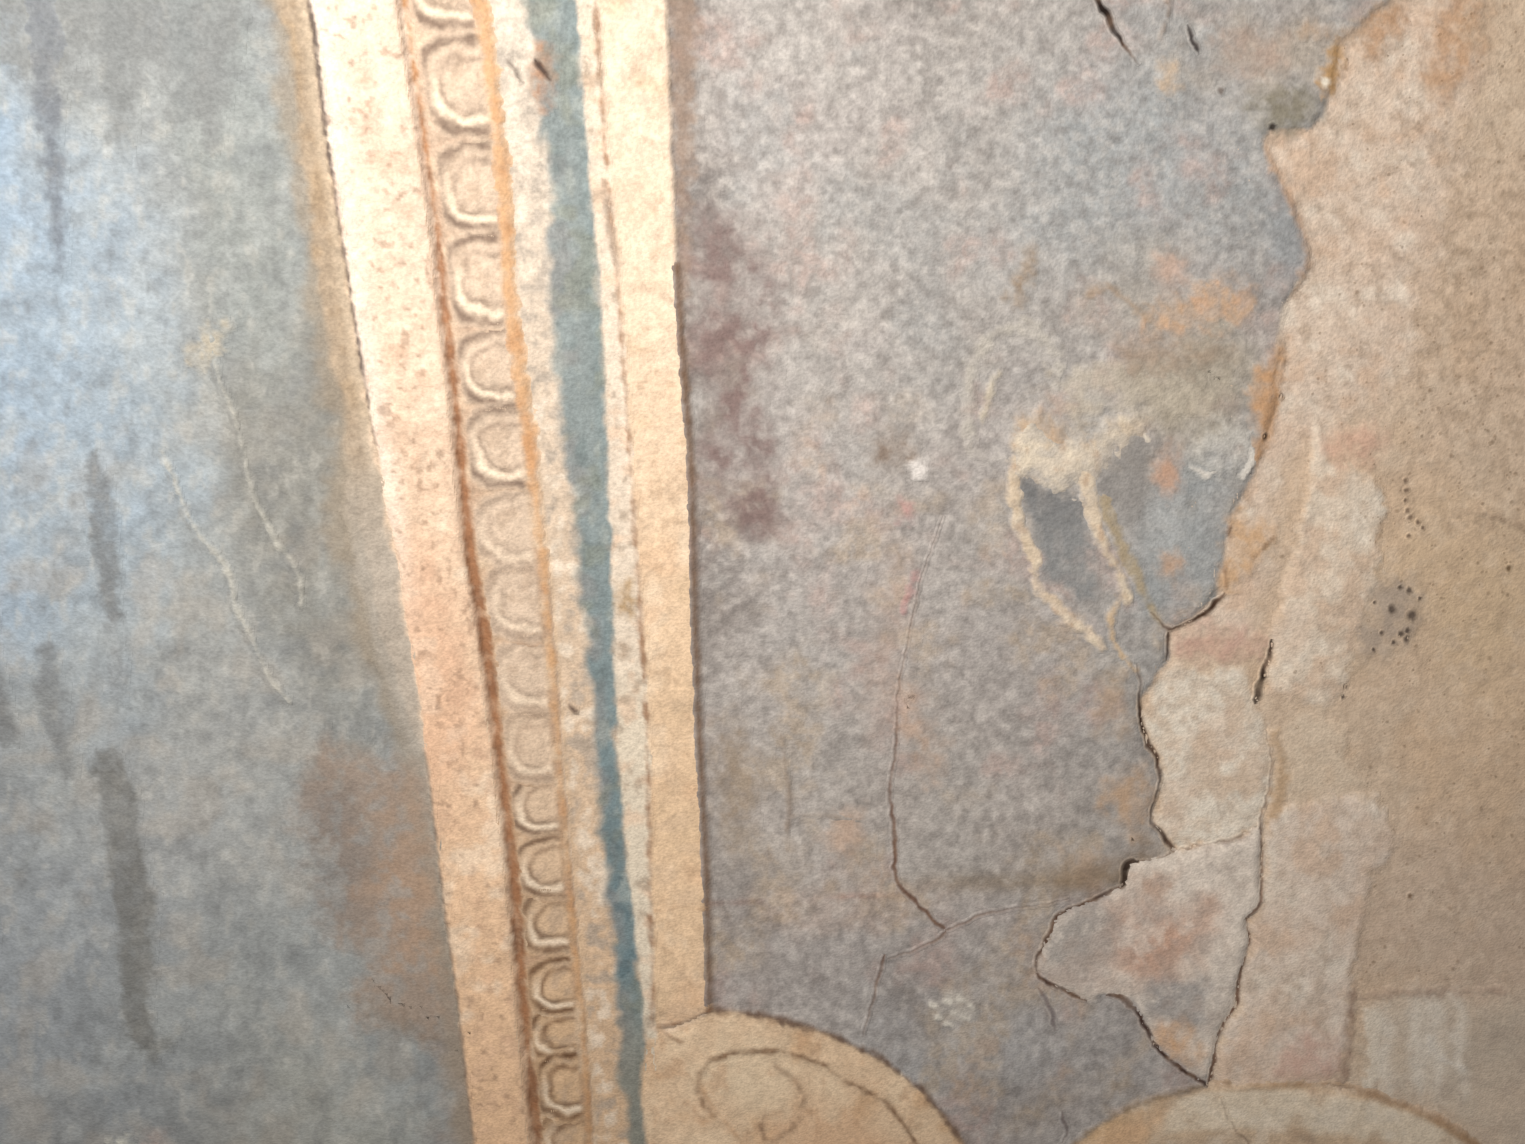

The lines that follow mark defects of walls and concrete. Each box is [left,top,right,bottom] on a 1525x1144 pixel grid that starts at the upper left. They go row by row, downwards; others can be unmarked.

crack [1092,0,1202,67]
crack [776,515,1278,1144]
flaking render [956,0,1503,851]
leakage [1347,568,1432,676]